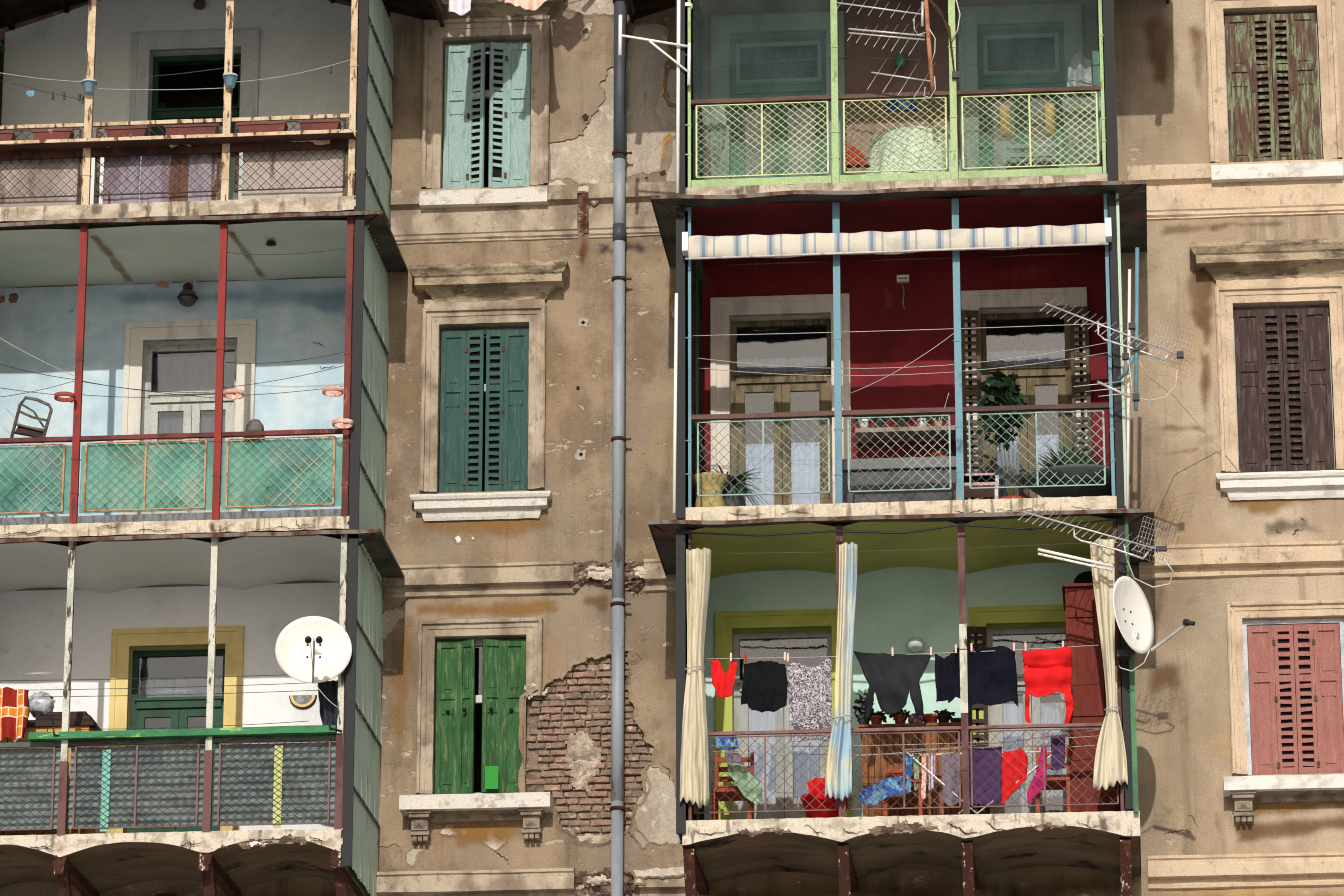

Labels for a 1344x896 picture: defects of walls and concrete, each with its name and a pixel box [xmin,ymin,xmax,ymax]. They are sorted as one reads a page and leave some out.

peeling [563,0,614,41]
peeling [546,21,676,235]
spalling [238,834,308,849]
spalling [518,630,684,896]